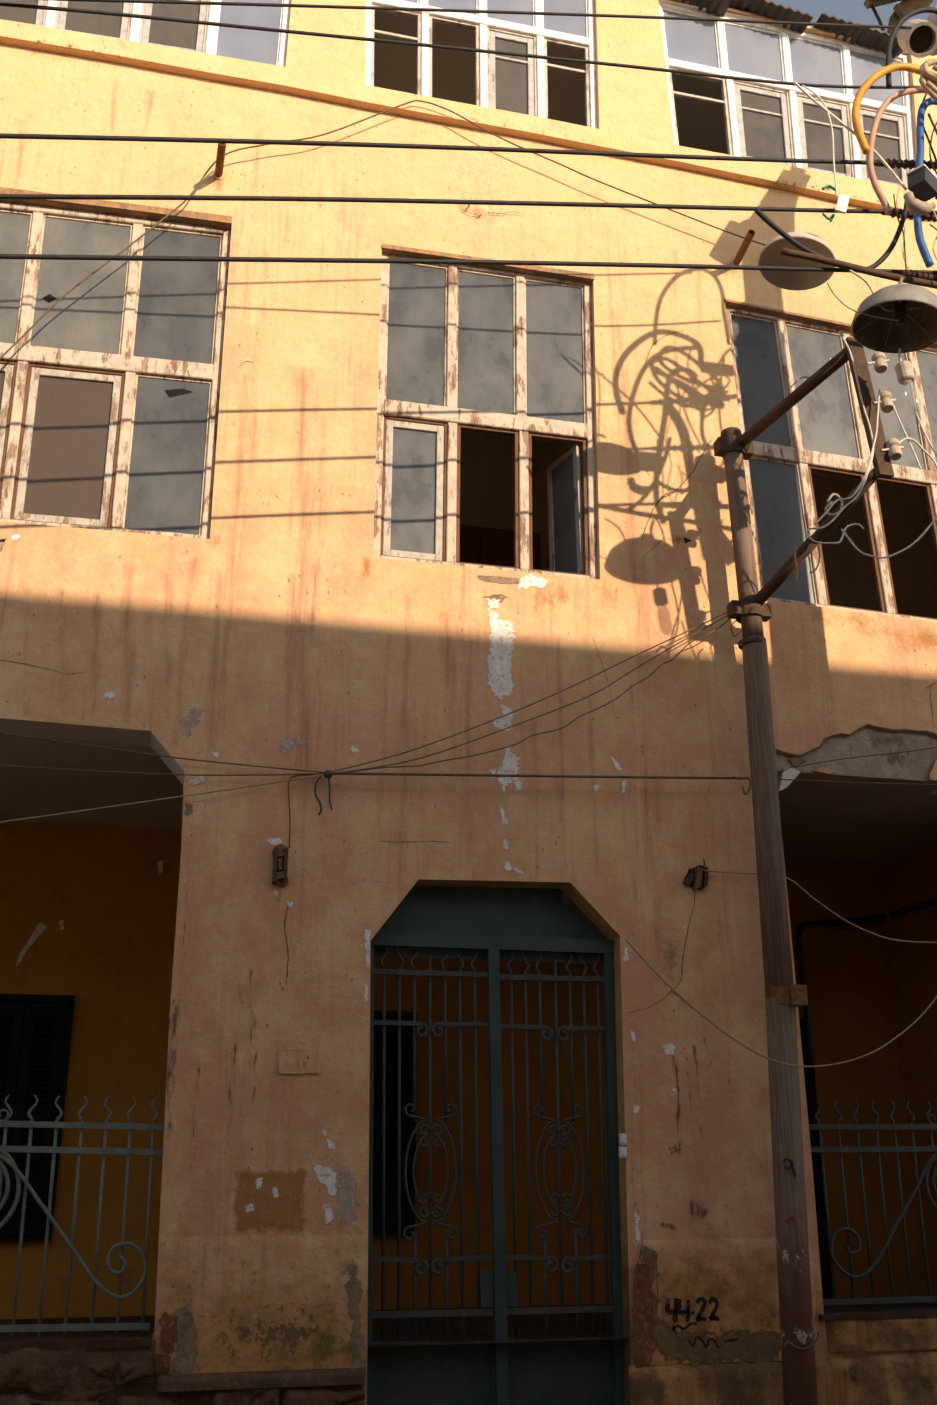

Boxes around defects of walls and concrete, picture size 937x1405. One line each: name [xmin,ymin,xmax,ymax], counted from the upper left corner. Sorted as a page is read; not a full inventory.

peeling [478,573,550,874]
flaking render [776,724,937,792]
peeling [313,1130,360,1227]
leakage [215,1303,334,1366]
flaking render [632,1212,781,1369]